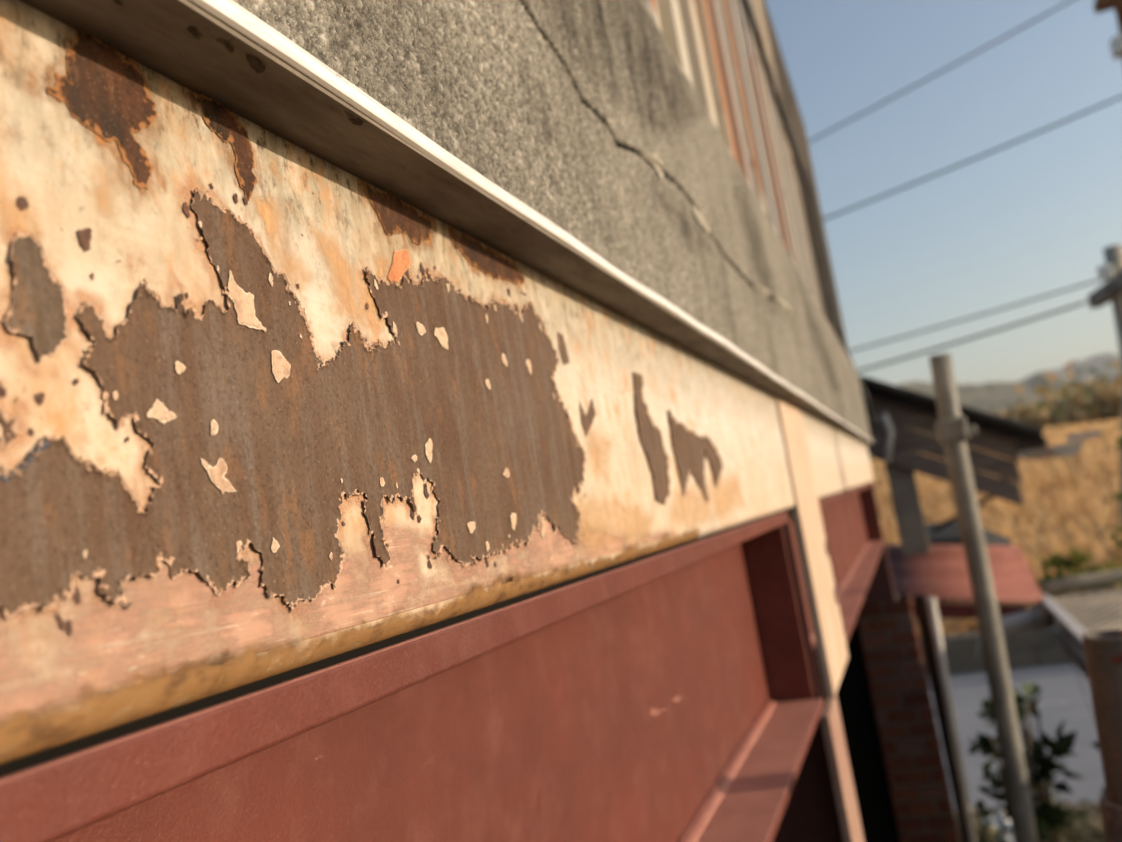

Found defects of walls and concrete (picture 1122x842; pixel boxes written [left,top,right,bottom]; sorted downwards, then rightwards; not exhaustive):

corrosion [17,196,29,210]
corrosion [78,227,92,251]
corrosion [30,28,166,193]
corrosion [182,86,277,241]
corrosion [317,236,374,322]
corrosion [358,179,525,285]
crack [519,0,694,206]
crack [710,234,788,312]
peeling [0,183,674,724]
peeling [633,372,724,505]